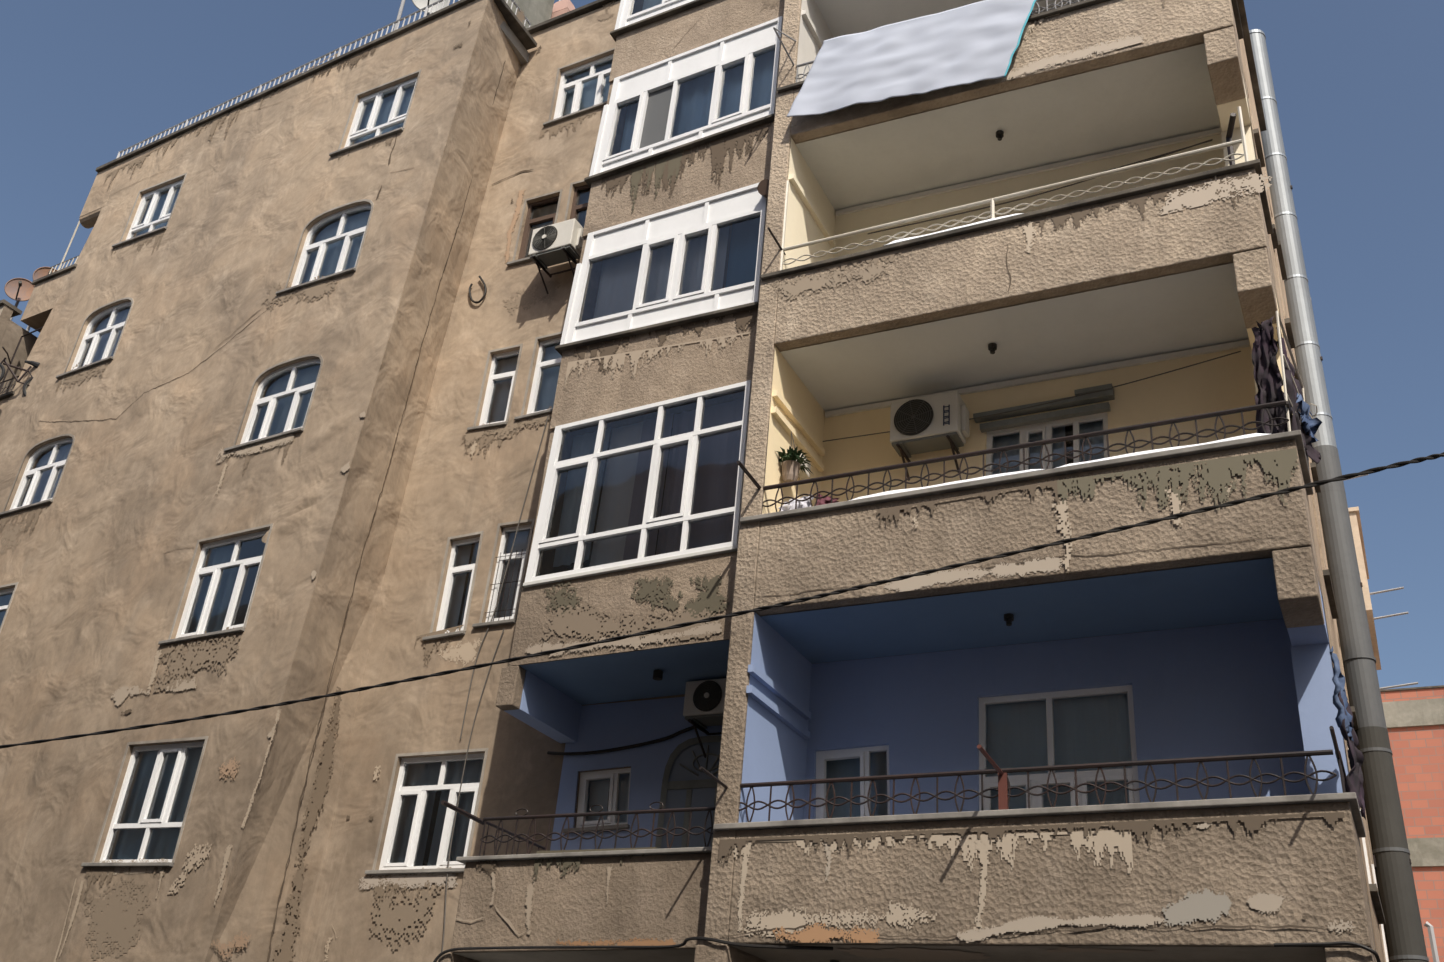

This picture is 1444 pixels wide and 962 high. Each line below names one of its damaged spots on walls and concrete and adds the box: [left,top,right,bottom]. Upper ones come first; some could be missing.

water stain [601,122,771,213]
spalling [525,621,722,657]